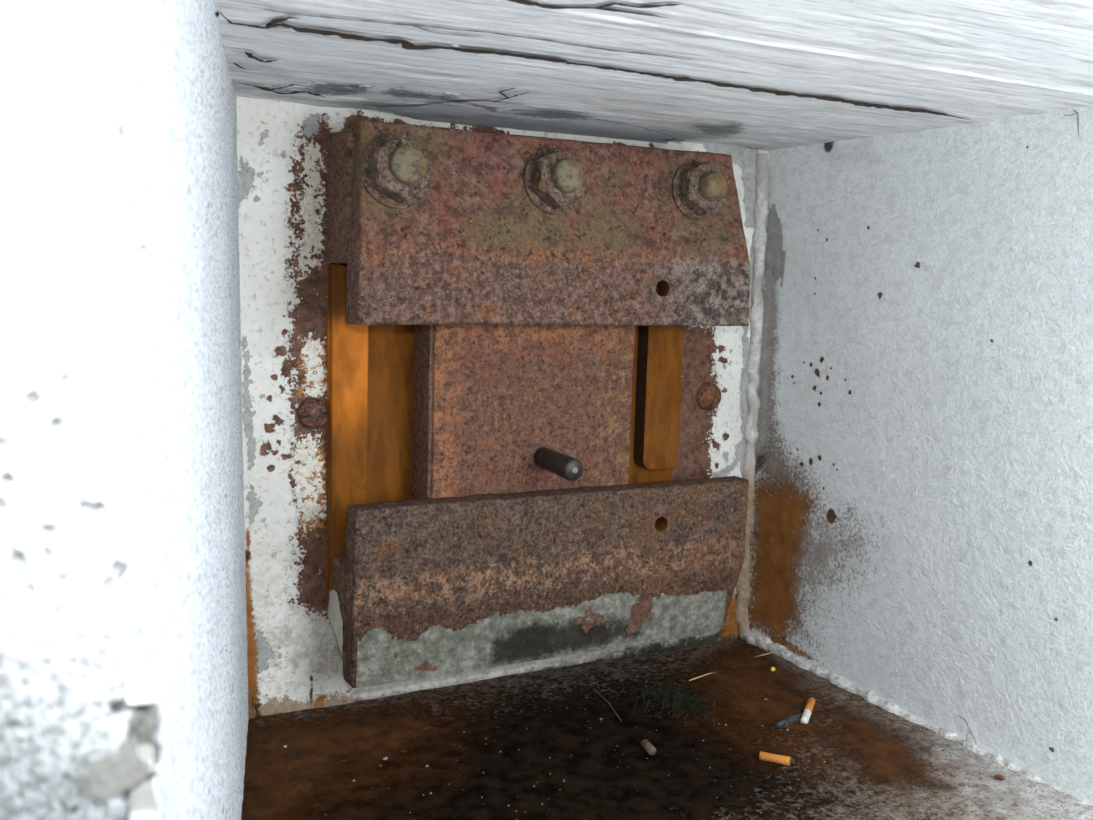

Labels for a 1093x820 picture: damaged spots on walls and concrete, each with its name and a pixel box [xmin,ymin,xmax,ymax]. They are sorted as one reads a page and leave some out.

crack [215,5,970,120]
crack [508,0,679,18]
peeling [238,110,510,625]
peeling [254,630,282,674]
leakage [532,590,741,671]
corrosion [694,446,947,790]